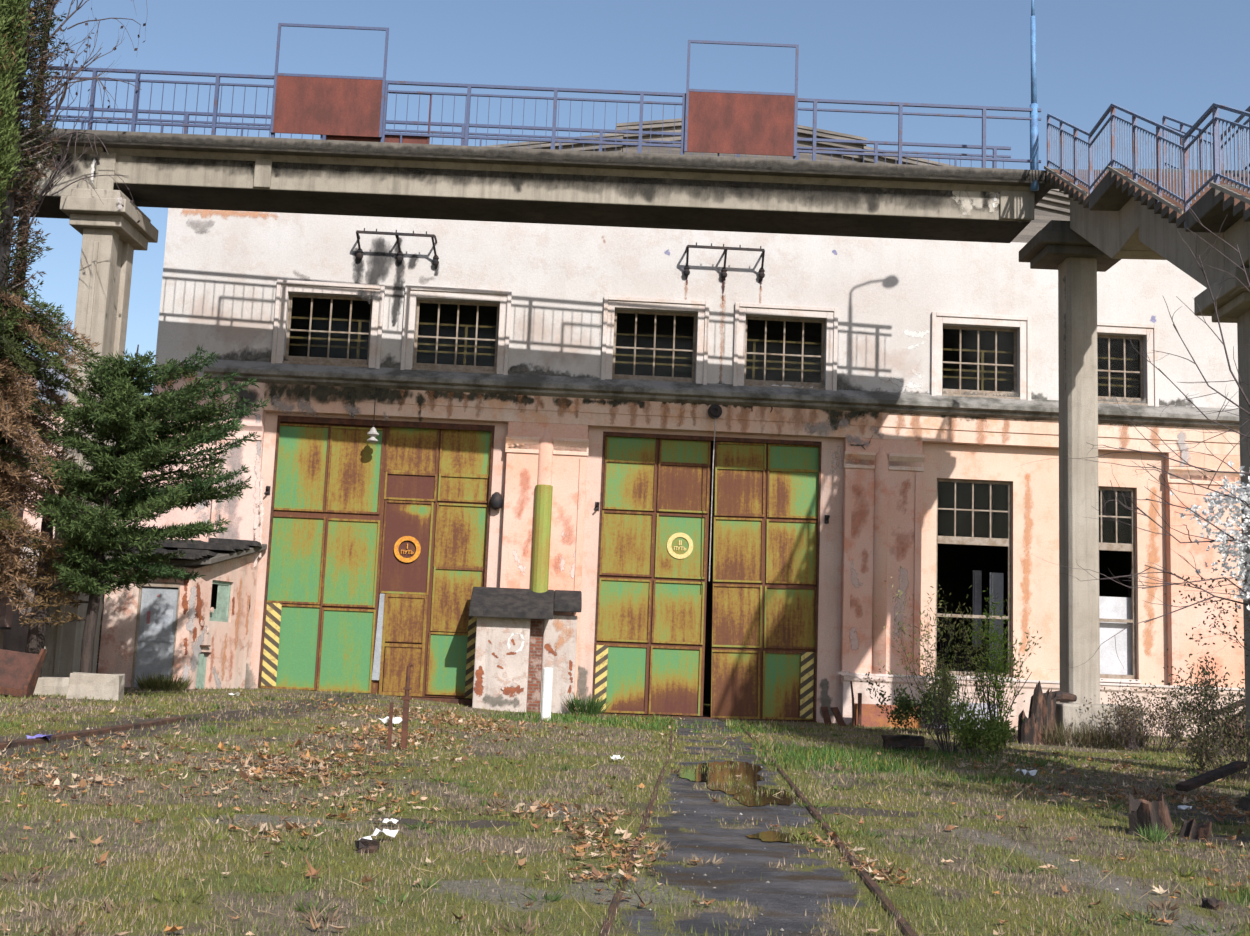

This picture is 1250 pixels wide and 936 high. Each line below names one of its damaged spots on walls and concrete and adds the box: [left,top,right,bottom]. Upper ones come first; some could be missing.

water stain [37,133,1046,217]
water stain [353,238,418,326]
water stain [553,398,645,408]
flaking render [182,579,232,689]
flaking render [473,639,516,696]
flaking render [501,683,524,697]
flaking render [544,644,573,694]